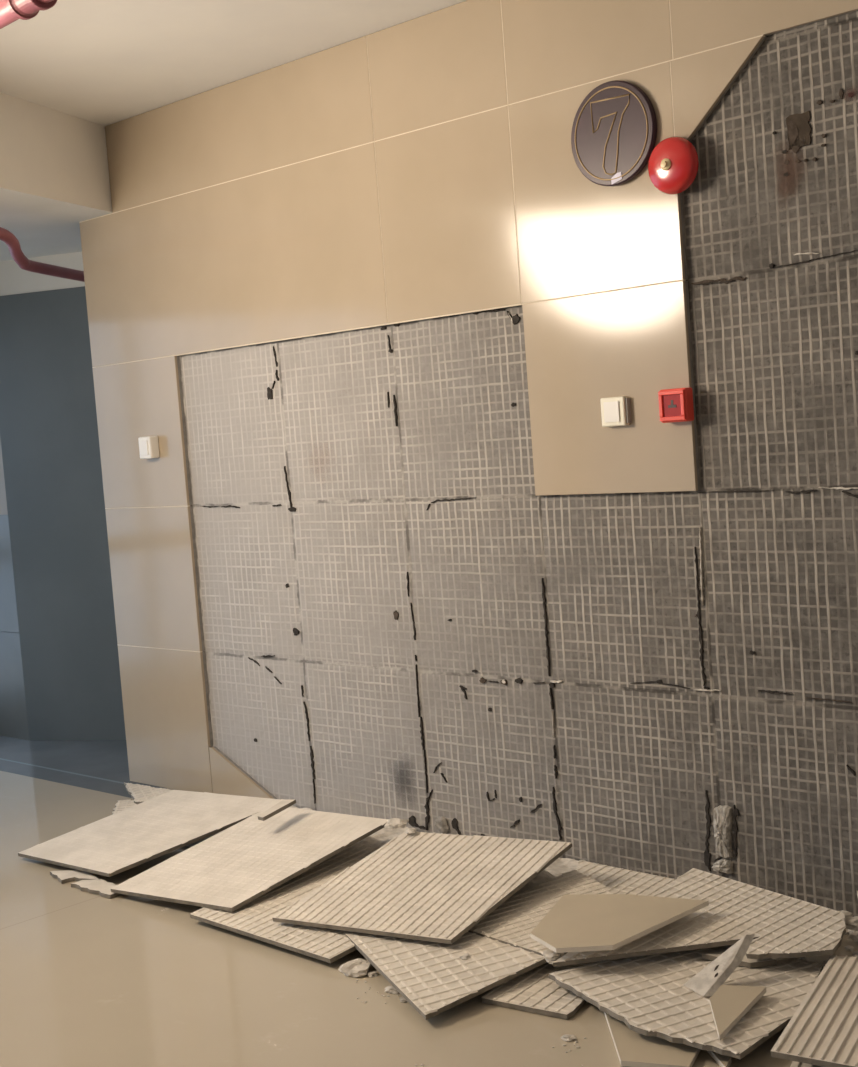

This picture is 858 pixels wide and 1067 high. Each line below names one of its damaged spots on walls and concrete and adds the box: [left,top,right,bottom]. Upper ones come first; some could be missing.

spalling [772,100,835,176]
spalling [434,309,521,325]
spalling [472,670,523,685]
spalling [257,799,296,821]